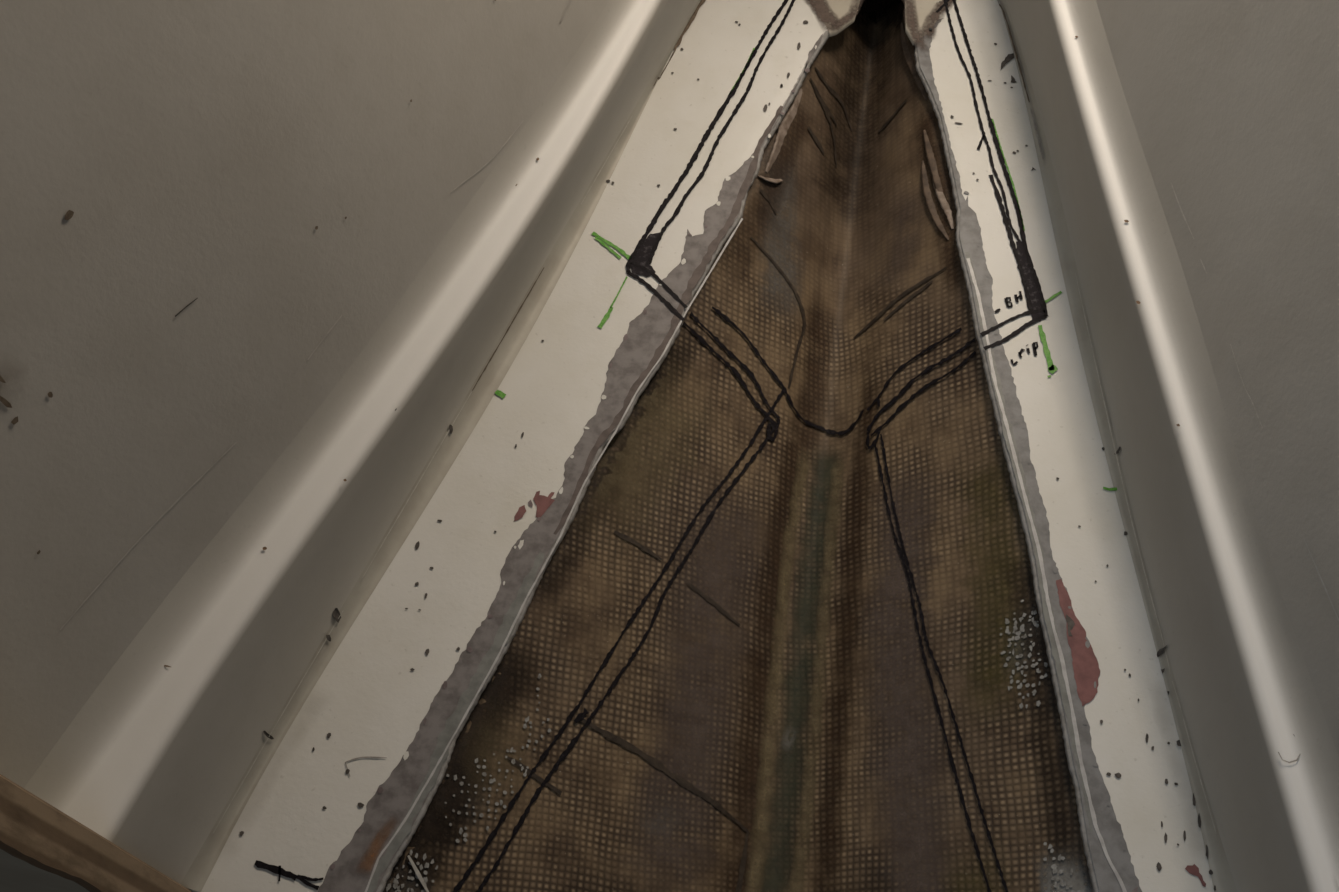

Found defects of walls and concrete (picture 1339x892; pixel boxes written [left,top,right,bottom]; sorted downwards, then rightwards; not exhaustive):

peeling [318,34,823,892]
peeling [900,18,1142,892]
peeling [1161,793,1201,846]
peeling [1185,845,1216,891]